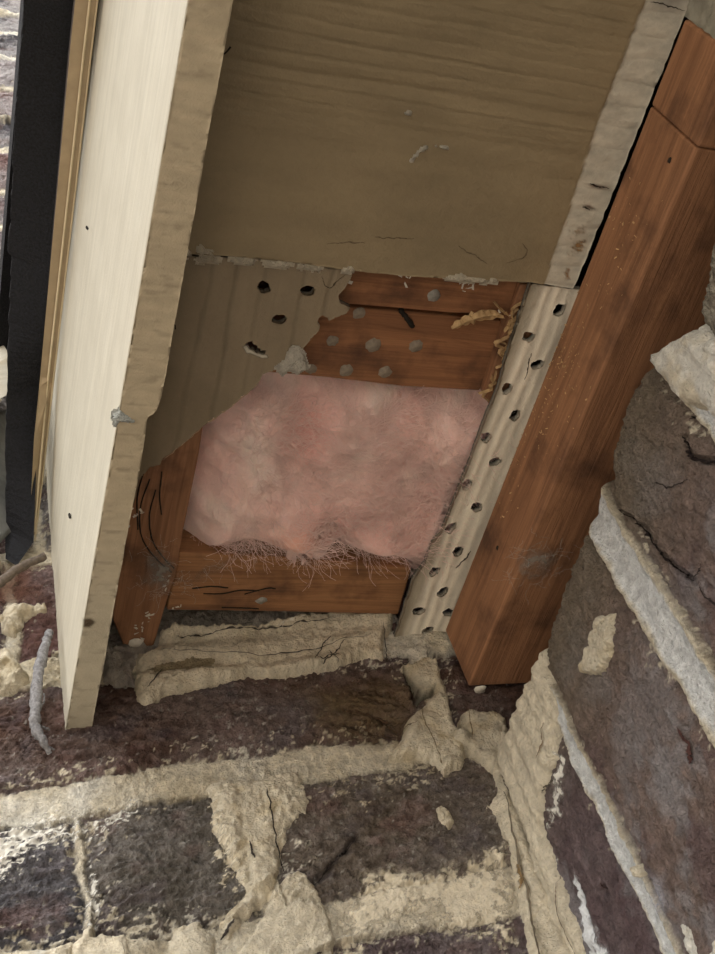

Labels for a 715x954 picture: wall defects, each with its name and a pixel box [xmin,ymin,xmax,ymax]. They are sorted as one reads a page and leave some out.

peeling [186,244,324,273]
peeling [443,273,499,286]
peeling [244,345,311,377]
peeling [110,405,135,427]
crack [655,416,715,489]
crack [618,509,715,605]
damp [0,799,142,879]
crack [267,789,284,871]